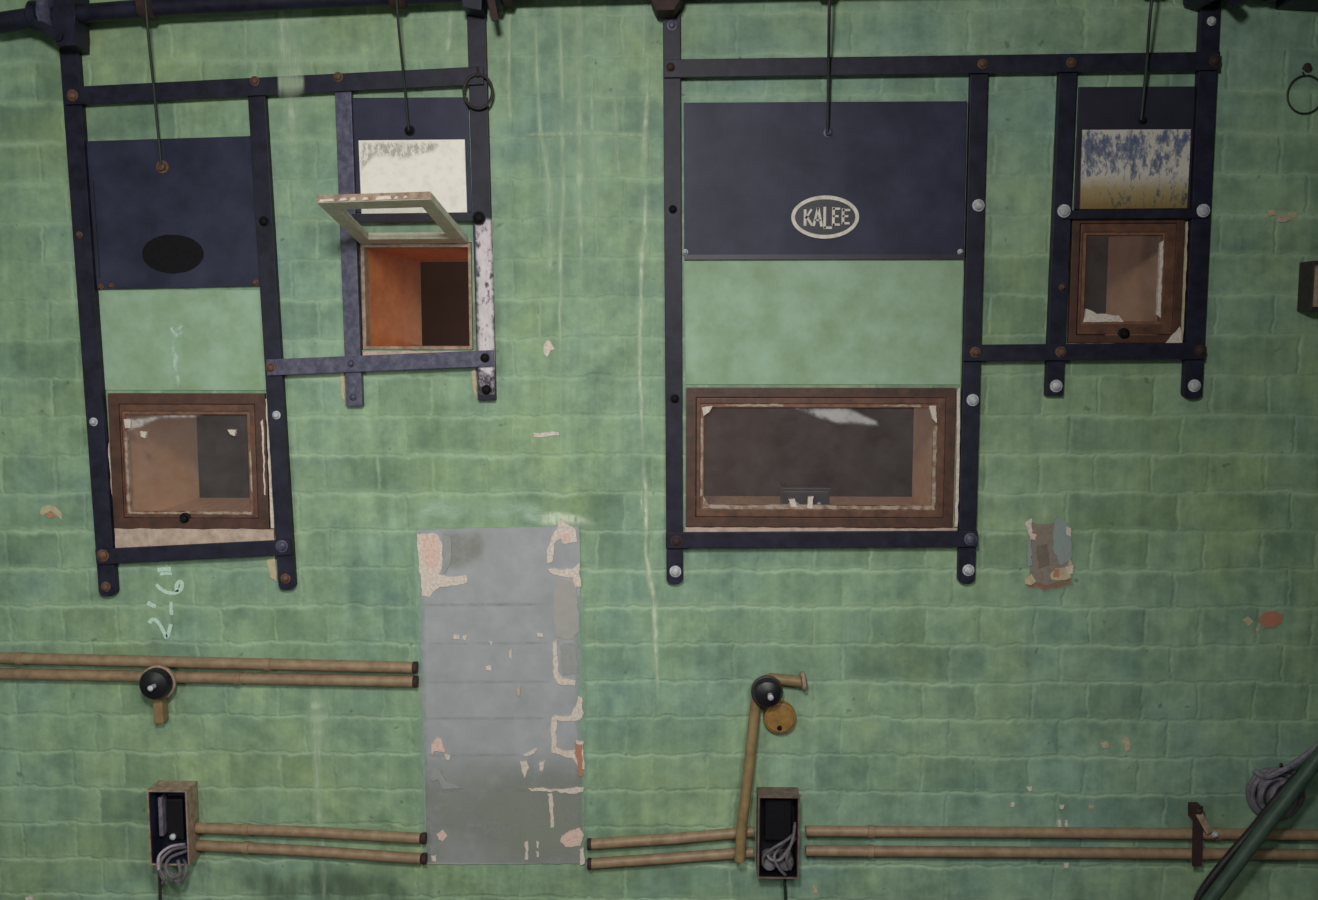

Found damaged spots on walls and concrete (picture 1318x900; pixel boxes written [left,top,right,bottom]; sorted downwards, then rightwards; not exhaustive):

peeling [417,533,468,597]
flaking render [1024,517,1074,589]
peeling [520,518,585,865]
peeling [431,737,451,760]
peeling [431,829,447,861]